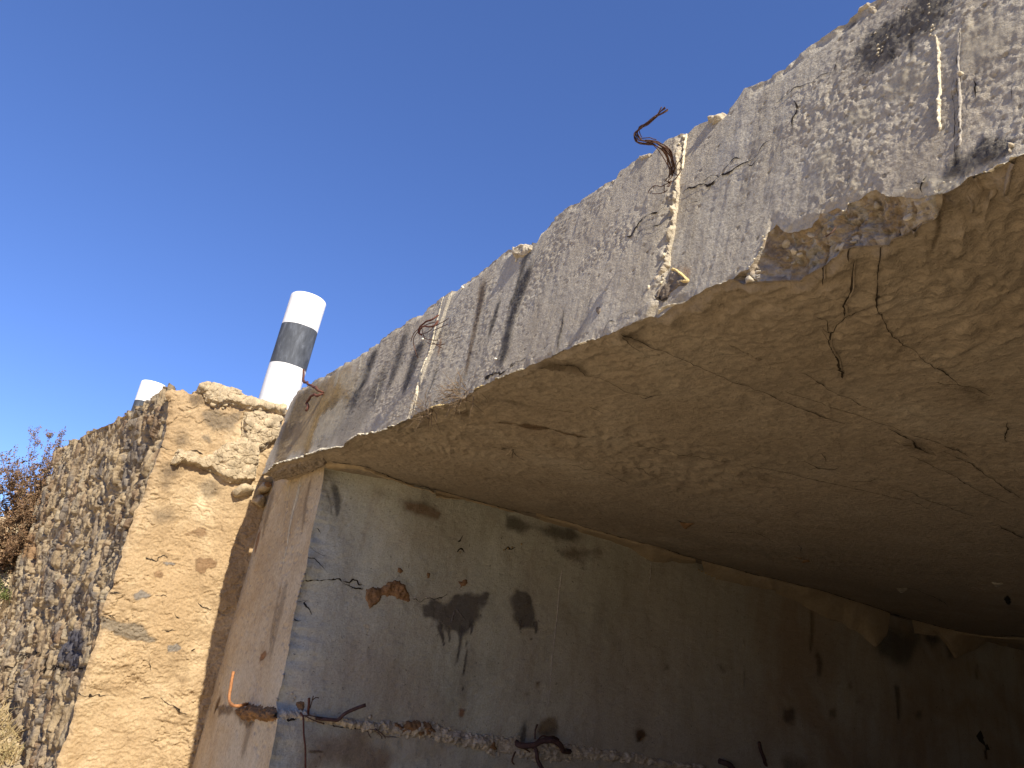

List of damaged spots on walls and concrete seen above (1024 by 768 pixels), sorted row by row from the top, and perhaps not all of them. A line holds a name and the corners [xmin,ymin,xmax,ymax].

leakage [874,3,937,61]
crack [627,140,770,238]
spalling [713,175,959,286]
leakage [500,270,530,362]
leakage [359,351,376,387]
leakage [404,345,422,390]
crack [607,245,1022,538]
crack [306,528,363,589]
leakage [423,593,489,674]
leakage [512,591,537,640]